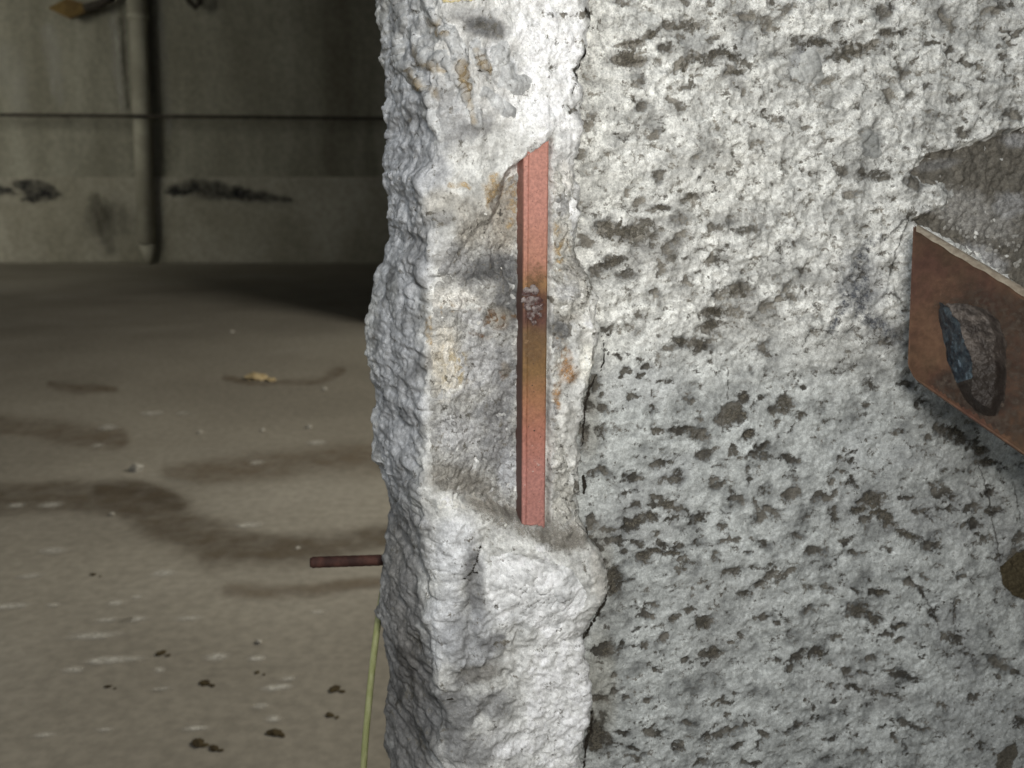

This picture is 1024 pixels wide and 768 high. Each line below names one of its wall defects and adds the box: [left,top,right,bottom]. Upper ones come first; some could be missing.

spalling [428,173,518,510]
spalling [551,171,594,524]
crack [580,336,605,447]
crack [580,475,588,494]
crack [583,594,607,639]
crack [583,708,594,768]